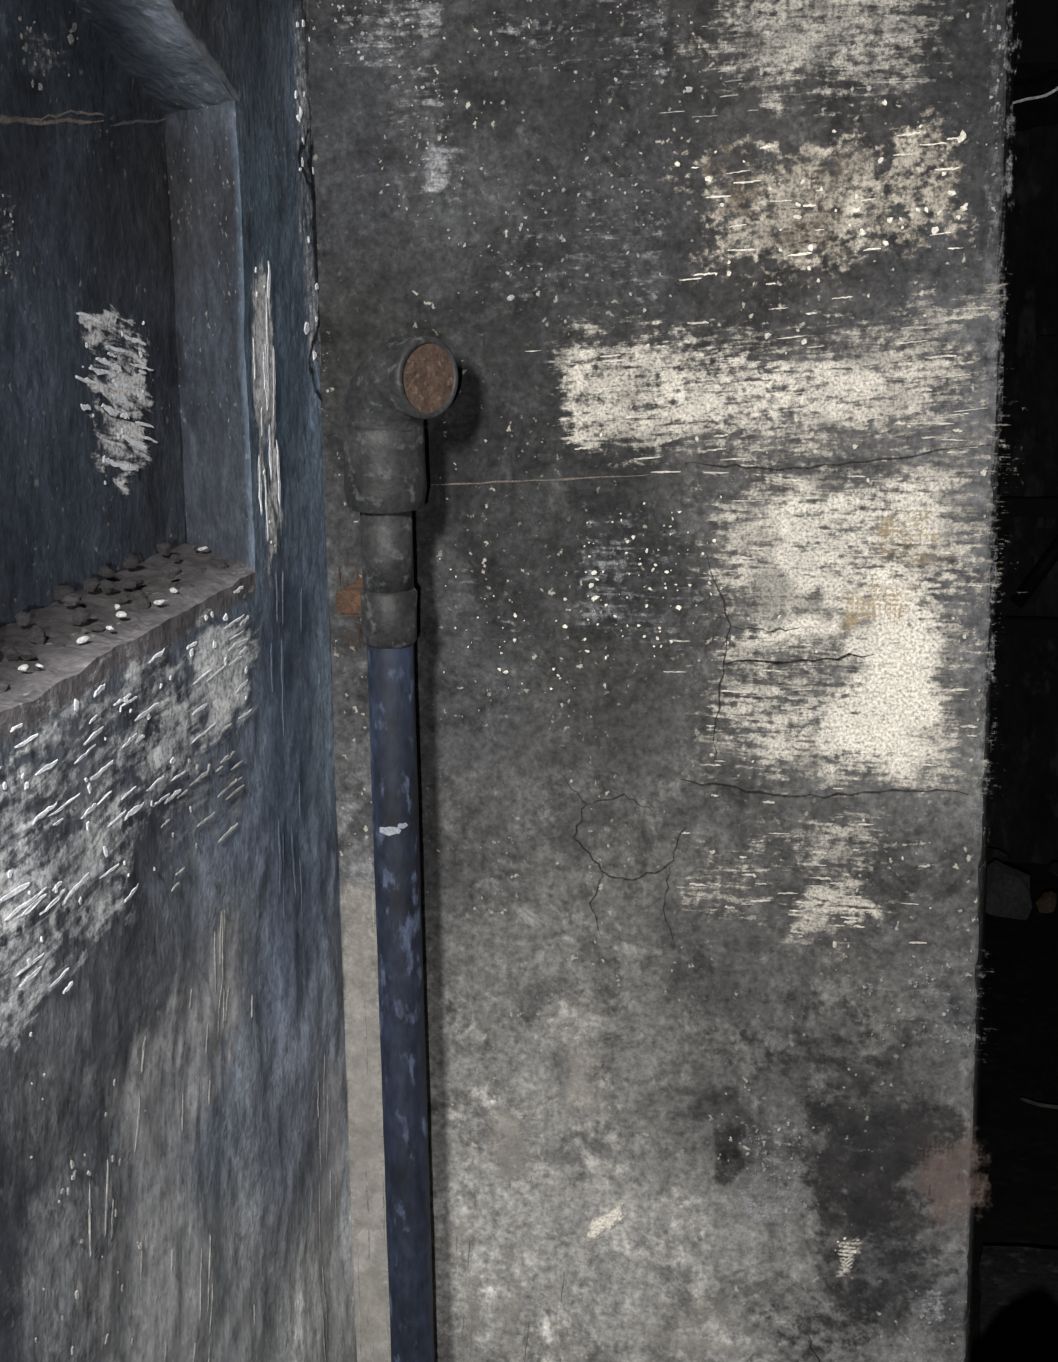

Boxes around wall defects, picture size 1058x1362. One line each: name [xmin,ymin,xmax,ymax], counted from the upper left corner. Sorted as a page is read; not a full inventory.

crack [0,110,105,125]
leakage [760,1084,964,1362]